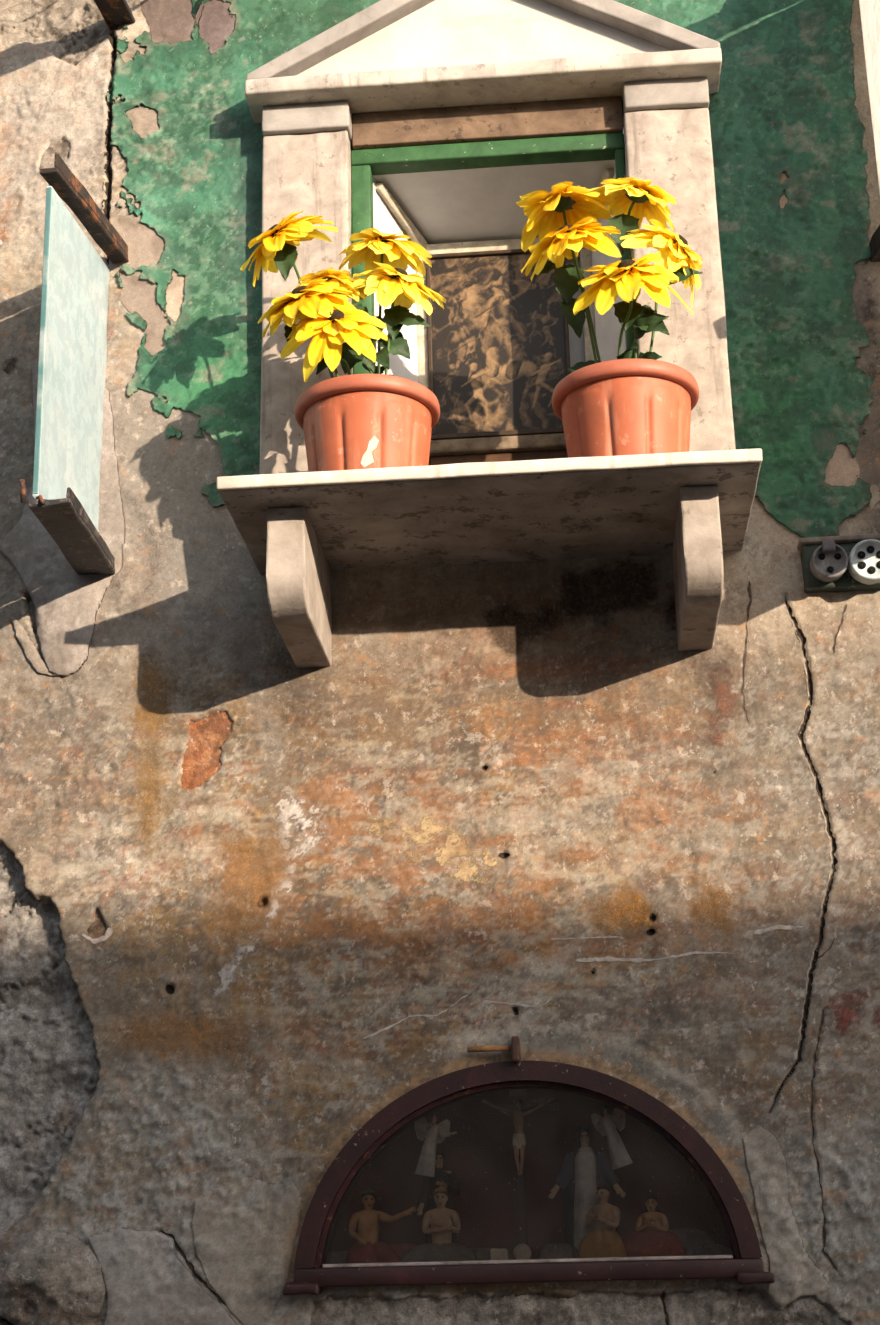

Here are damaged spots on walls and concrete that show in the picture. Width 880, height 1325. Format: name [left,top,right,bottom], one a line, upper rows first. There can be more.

flaking render [0,0,117,66]
peeling [127,0,236,54]
peeling [126,104,160,138]
peeling [104,215,186,356]
peeling [825,444,880,508]
flaking render [11,596,60,677]
spalling [181,711,233,789]
flaking render [81,910,113,944]
crack [741,581,847,1276]
spalling [0,843,100,1238]